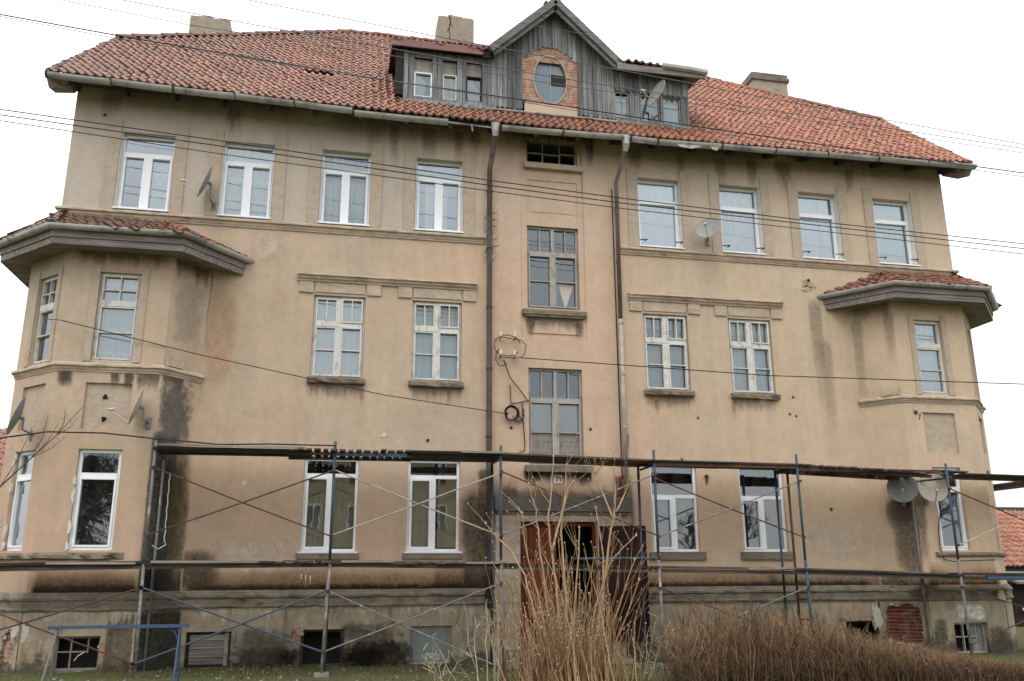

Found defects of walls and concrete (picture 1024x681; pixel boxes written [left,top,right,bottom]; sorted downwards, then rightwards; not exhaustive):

leakage [59,371,71,382]
leakage [33,373,481,593]
leakage [648,490,999,587]
flaking render [839,600,927,646]